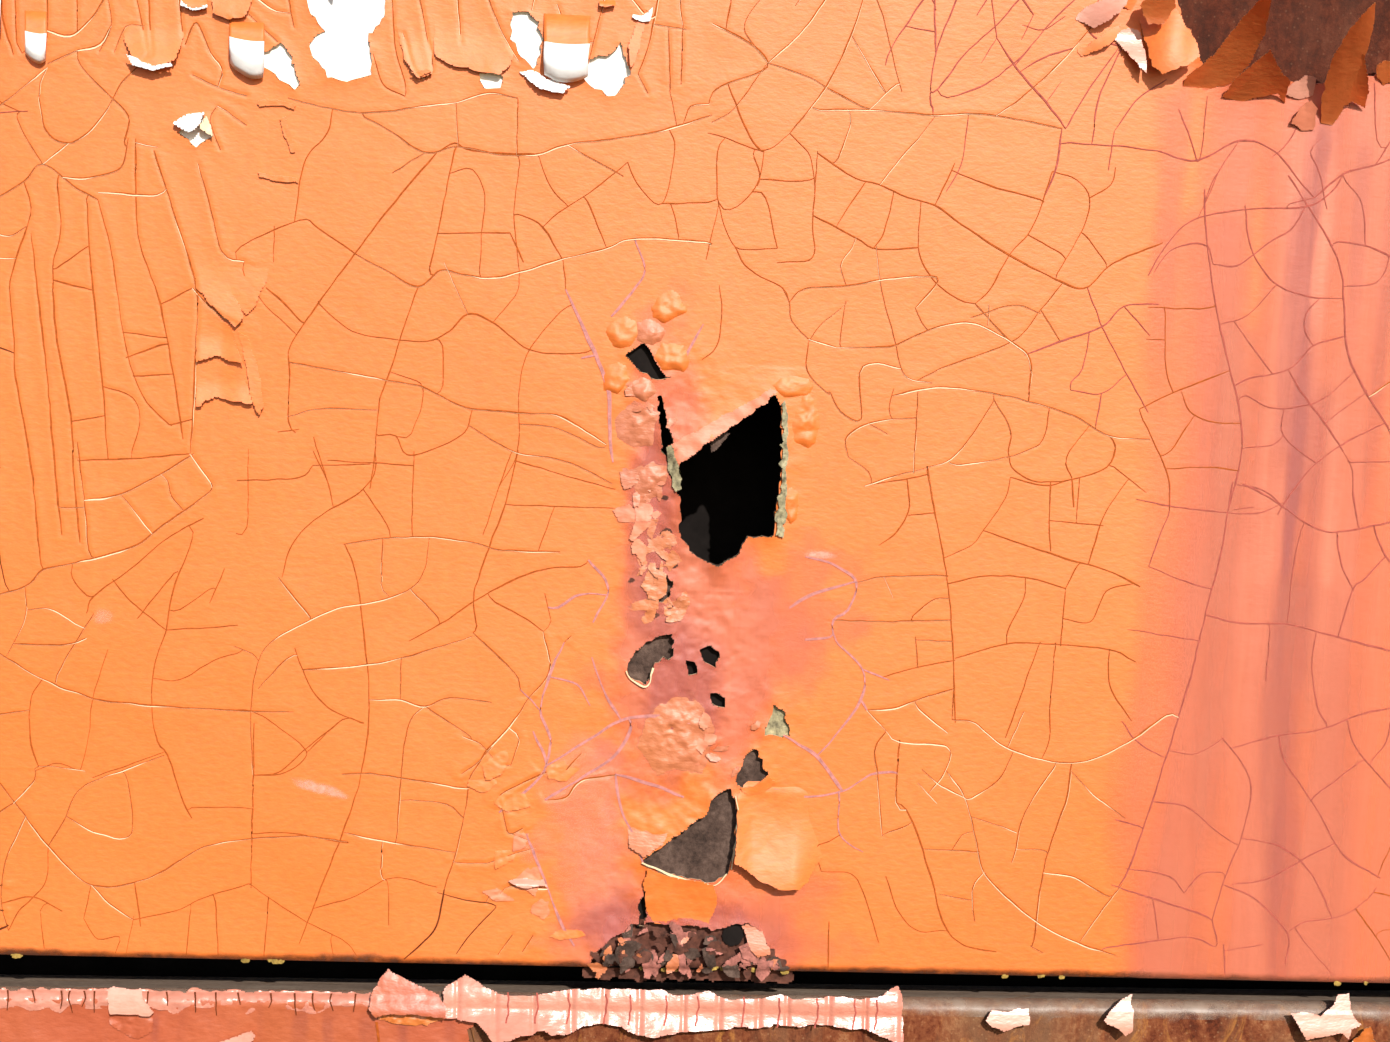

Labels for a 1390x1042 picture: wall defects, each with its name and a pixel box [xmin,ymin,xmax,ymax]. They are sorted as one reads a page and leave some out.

peeling [123,0,300,89]
peeling [307,0,653,96]
spalling [625,343,671,412]
corrosion [550,0,1390,984]
crack [783,83,1390,964]
peeling [613,465,720,688]
crack [0,633,684,959]
peeling [627,693,822,947]
corrosion [0,949,531,965]
peeling [0,969,904,1042]
corrosion [467,1016,1347,1042]
peeling [1291,981,1361,1040]